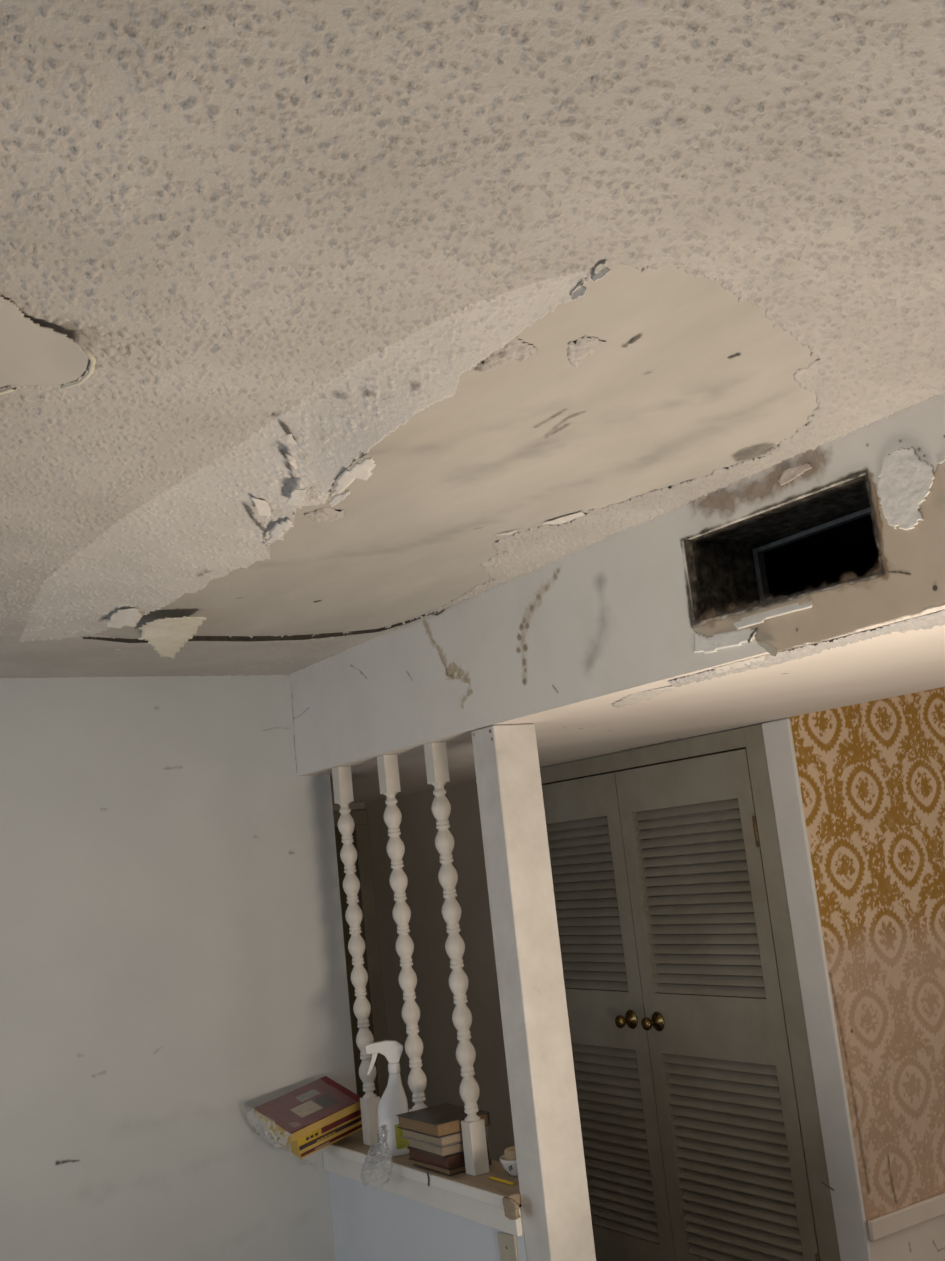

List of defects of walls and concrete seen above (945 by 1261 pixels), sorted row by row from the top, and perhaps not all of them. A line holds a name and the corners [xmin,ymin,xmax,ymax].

peeling [97,264,820,659]
peeling [692,441,945,673]
crack [83,636,148,644]
crack [188,611,438,642]
water stain [424,609,472,707]